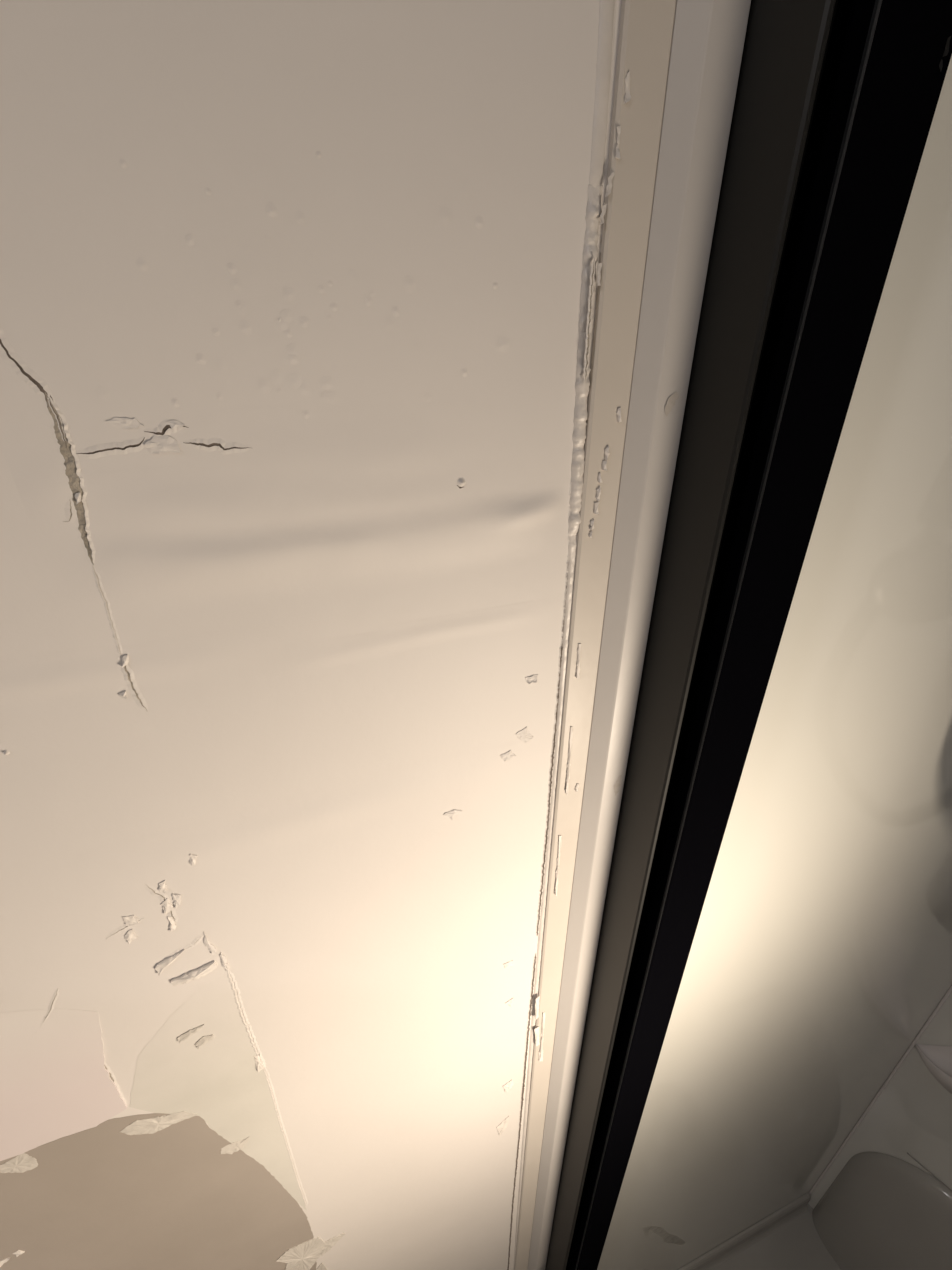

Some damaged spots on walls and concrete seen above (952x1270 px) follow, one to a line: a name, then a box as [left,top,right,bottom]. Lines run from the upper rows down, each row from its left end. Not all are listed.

crack [0,325,252,712]
peeling [145,880,182,932]
peeling [0,933,346,1270]